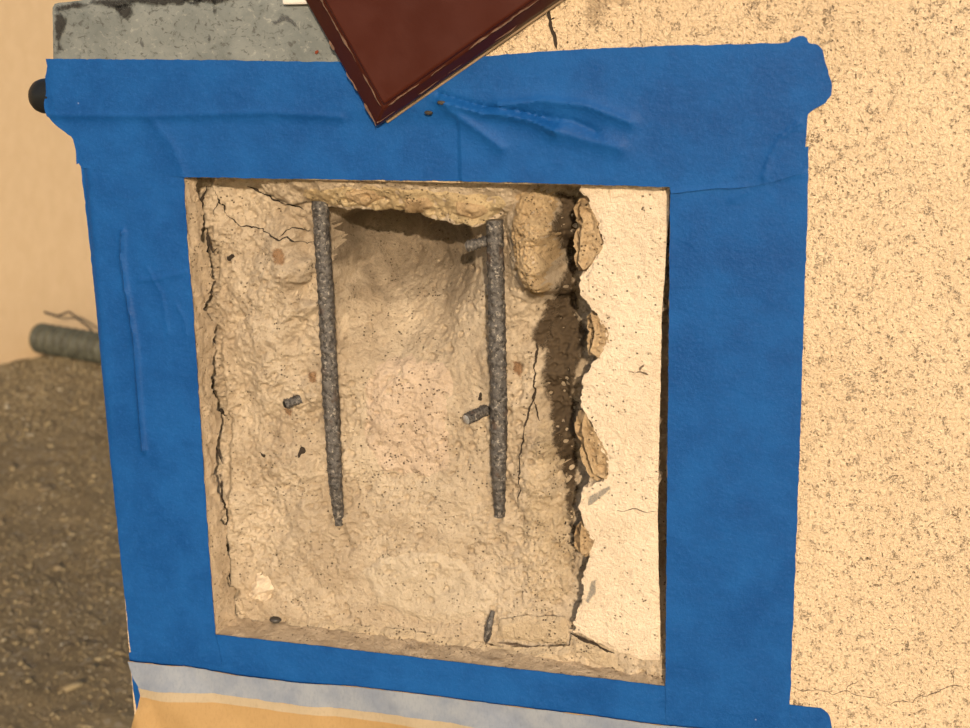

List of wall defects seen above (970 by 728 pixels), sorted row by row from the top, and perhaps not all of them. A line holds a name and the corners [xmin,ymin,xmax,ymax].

crack [200,186,314,253]
spalling [573,196,604,271]
spalling [303,185,508,526]
water stain [533,295,564,348]
spalling [587,311,609,358]
crack [517,344,540,508]
water stain [556,429,570,473]
spalling [575,410,609,481]
spalling [574,519,595,557]
crack [795,671,968,706]